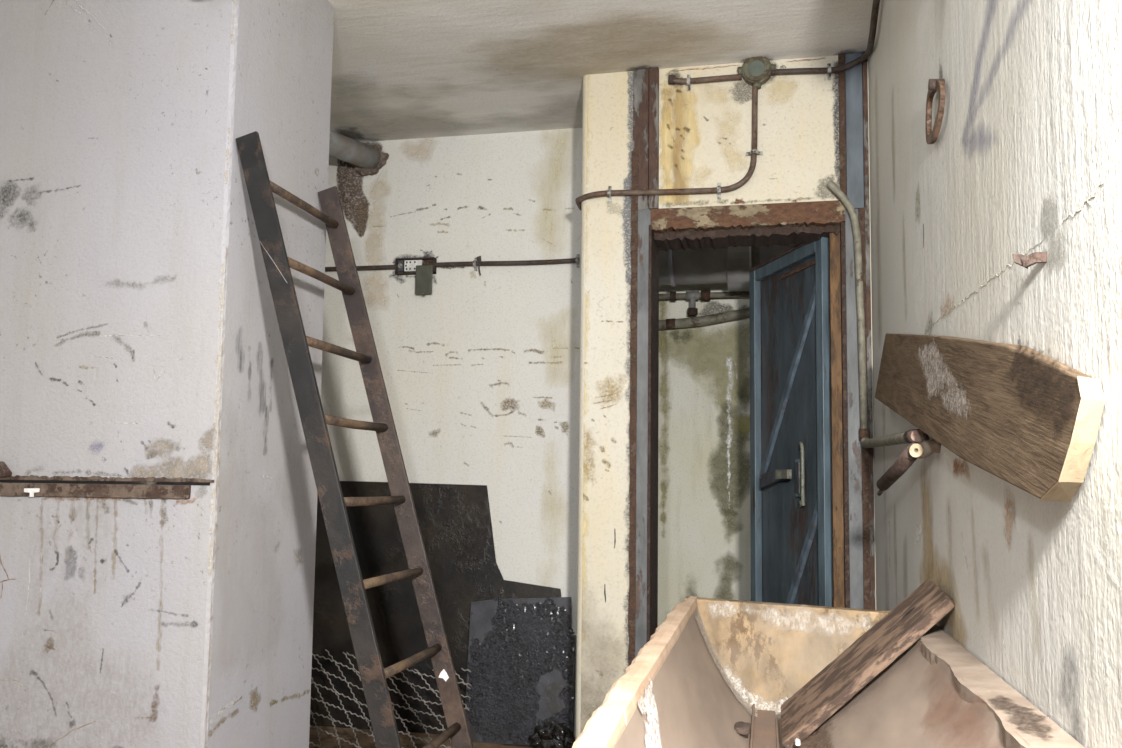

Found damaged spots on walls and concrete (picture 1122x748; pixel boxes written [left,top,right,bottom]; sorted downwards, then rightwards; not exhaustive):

spalling [337,159,369,237]
crack [930,182,1105,328]
leakage [659,300,750,535]
leakage [582,434,616,578]
leakage [718,556,738,600]